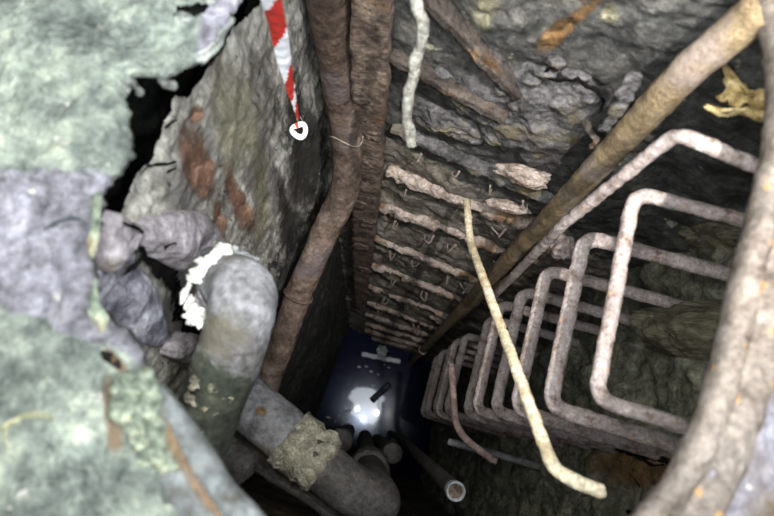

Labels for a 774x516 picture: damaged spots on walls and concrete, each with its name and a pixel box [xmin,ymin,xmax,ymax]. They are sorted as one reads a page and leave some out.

corrosion [539,0,596,47]
corrosion [179,129,215,198]
corrosion [214,169,255,237]